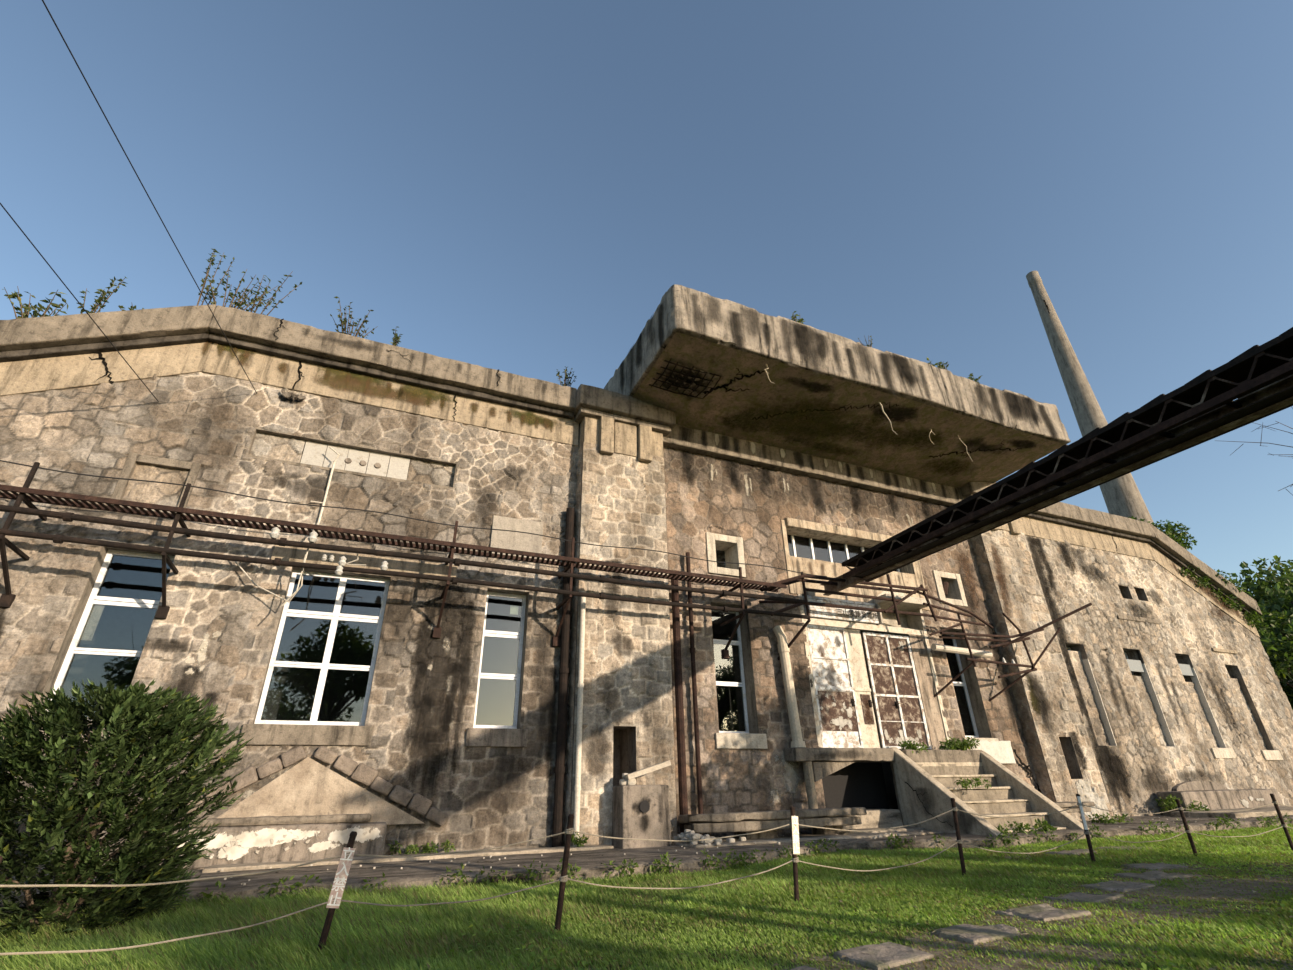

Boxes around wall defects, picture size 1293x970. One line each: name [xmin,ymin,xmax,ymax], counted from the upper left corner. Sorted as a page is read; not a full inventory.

crack [89,352,114,383]
crack [292,361,304,389]
leakage [620,304,663,390]
leakage [693,294,930,422]
leakage [962,438,1034,452]
rust [1173,563,1239,616]
leakage [407,581,475,791]
peeling [820,694,853,731]
peeling [884,729,922,745]
peeling [178,826,382,861]